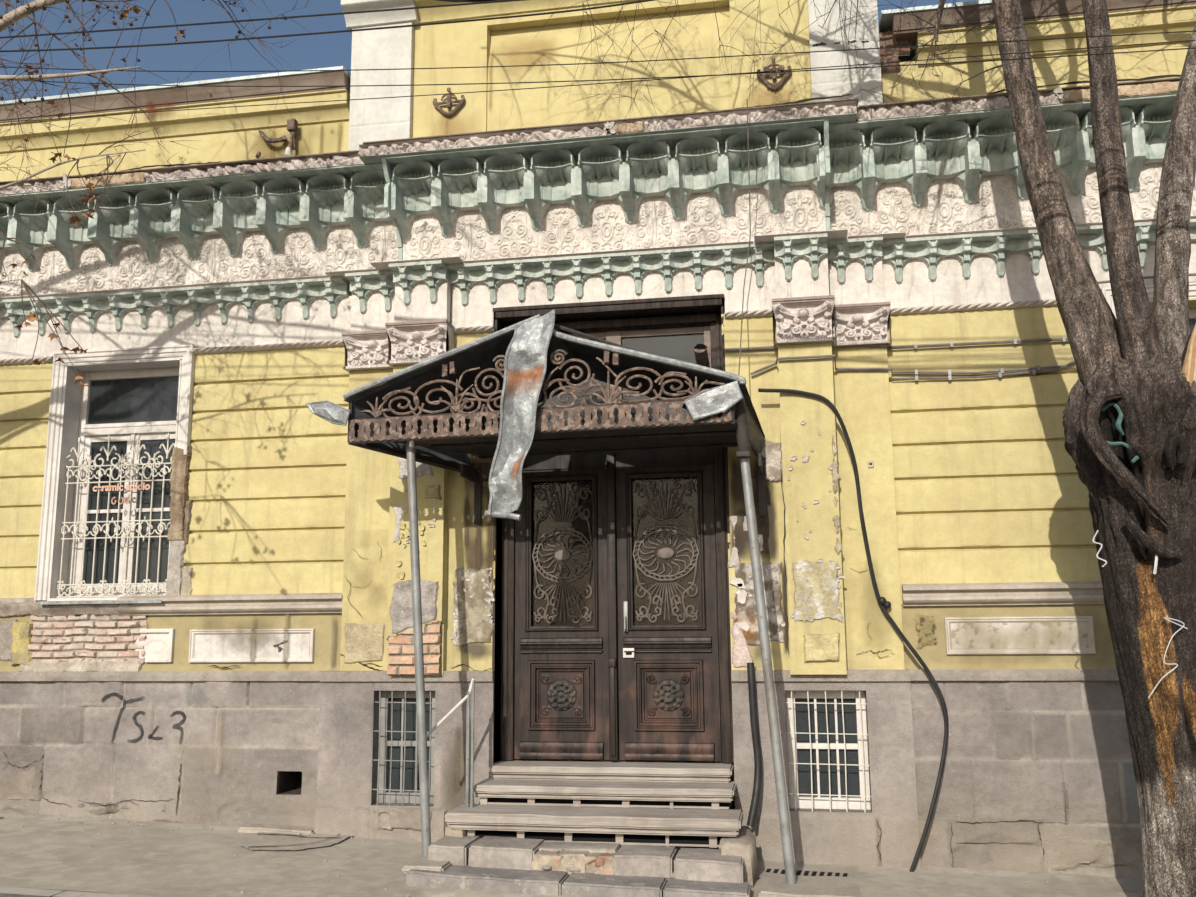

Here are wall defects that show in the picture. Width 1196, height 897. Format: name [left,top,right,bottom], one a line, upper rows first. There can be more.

rust [508,367,542,388]
spalling [184,500,193,544]
peeling [387,454,495,675]
flaking render [728,430,845,646]
flaking render [0,598,148,672]
crack [3,751,183,811]